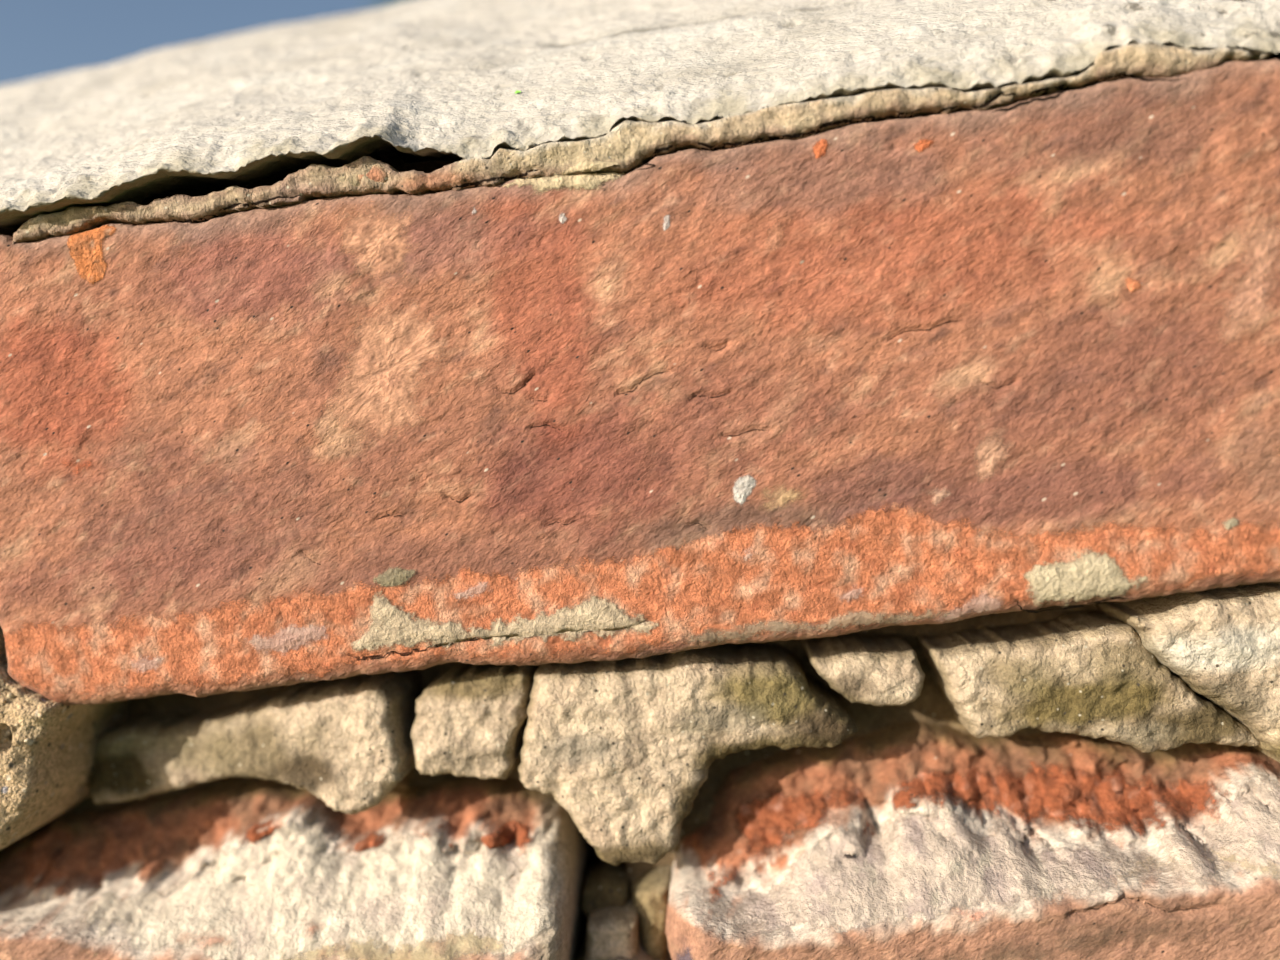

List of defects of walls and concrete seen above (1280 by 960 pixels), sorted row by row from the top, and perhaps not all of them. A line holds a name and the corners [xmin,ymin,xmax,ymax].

crack [629,72,1185,170]
crack [368,150,545,190]
crack [139,169,299,223]
spalling [891,761,1228,836]
spalling [243,818,280,844]
spalling [348,831,386,852]
spalling [481,820,531,850]
spalling [735,787,862,855]
spalling [708,868,737,902]